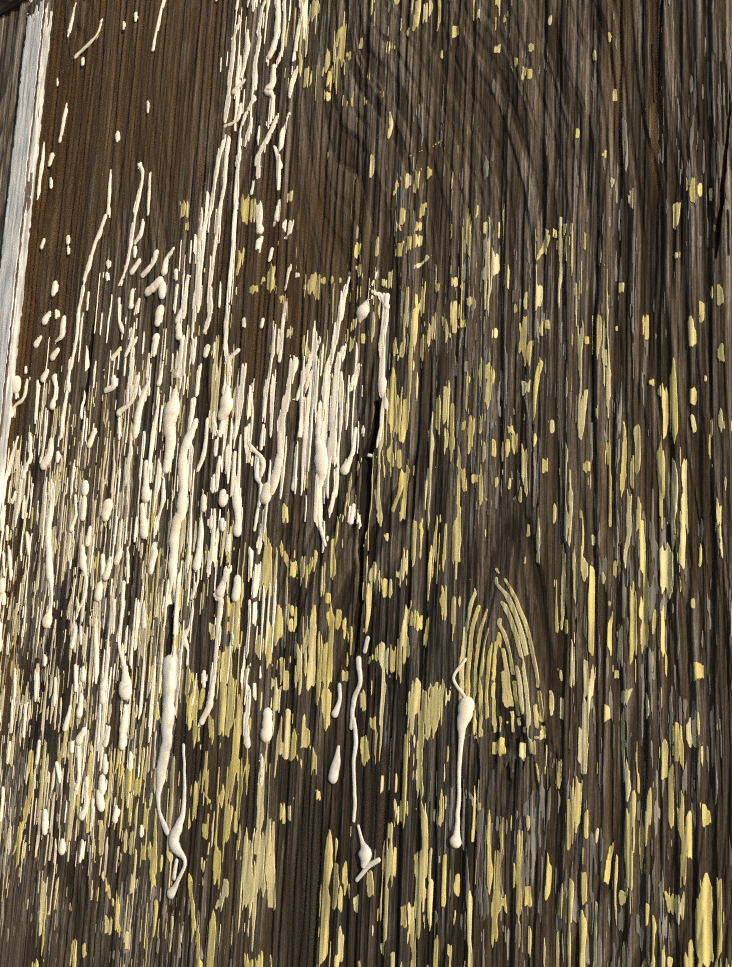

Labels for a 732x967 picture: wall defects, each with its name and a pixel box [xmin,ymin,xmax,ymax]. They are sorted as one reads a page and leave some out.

peeling [364,0,441,54]
peeling [473,0,482,22]
peeling [492,0,512,37]
peeling [511,43,553,105]
crack [652,0,663,103]
peeling [665,0,732,230]
peeling [0,0,367,967]
crack [353,401,380,659]
peeling [249,89,732,967]